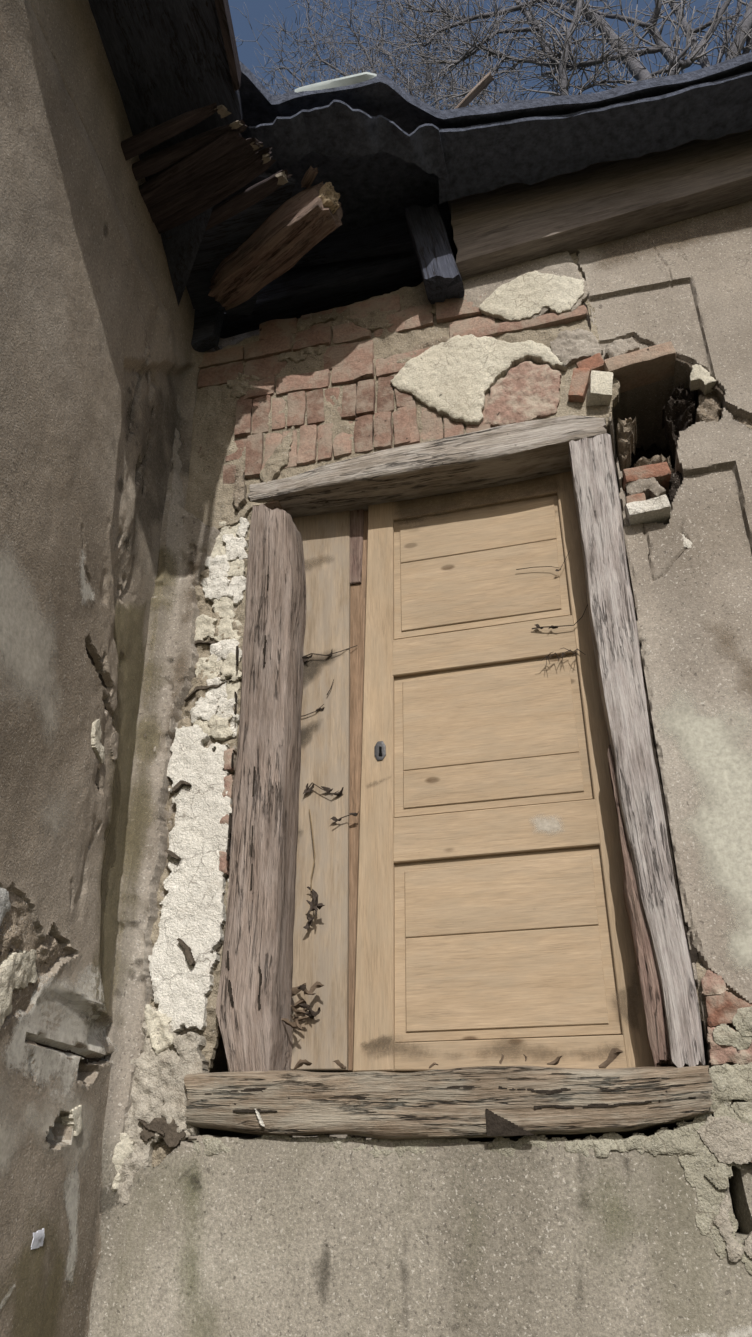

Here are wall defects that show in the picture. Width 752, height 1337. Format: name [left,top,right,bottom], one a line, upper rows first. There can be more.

peeling [0,888,112,1136]
leakage [42,549,175,1023]
spalling [111,251,752,1275]